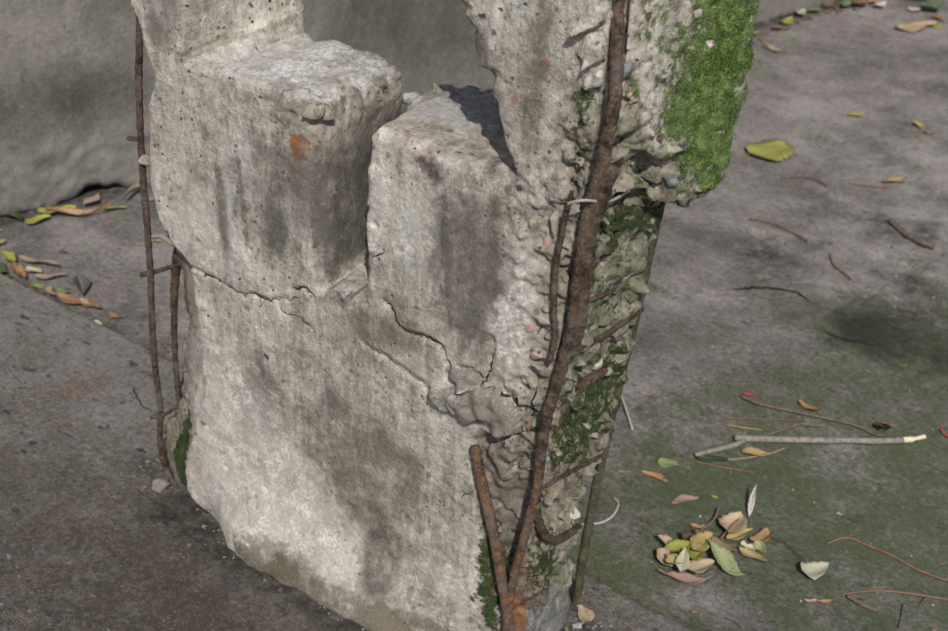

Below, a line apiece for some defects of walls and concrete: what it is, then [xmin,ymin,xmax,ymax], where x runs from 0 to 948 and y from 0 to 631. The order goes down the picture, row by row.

crack [195,268,313,329]
corrosion [290,135,310,159]
damp [261,101,403,305]
damp [390,189,421,271]
damp [417,157,442,181]
crack [364,300,538,438]
damp [437,190,538,366]
spalling [427,0,666,631]
damp [192,298,447,631]